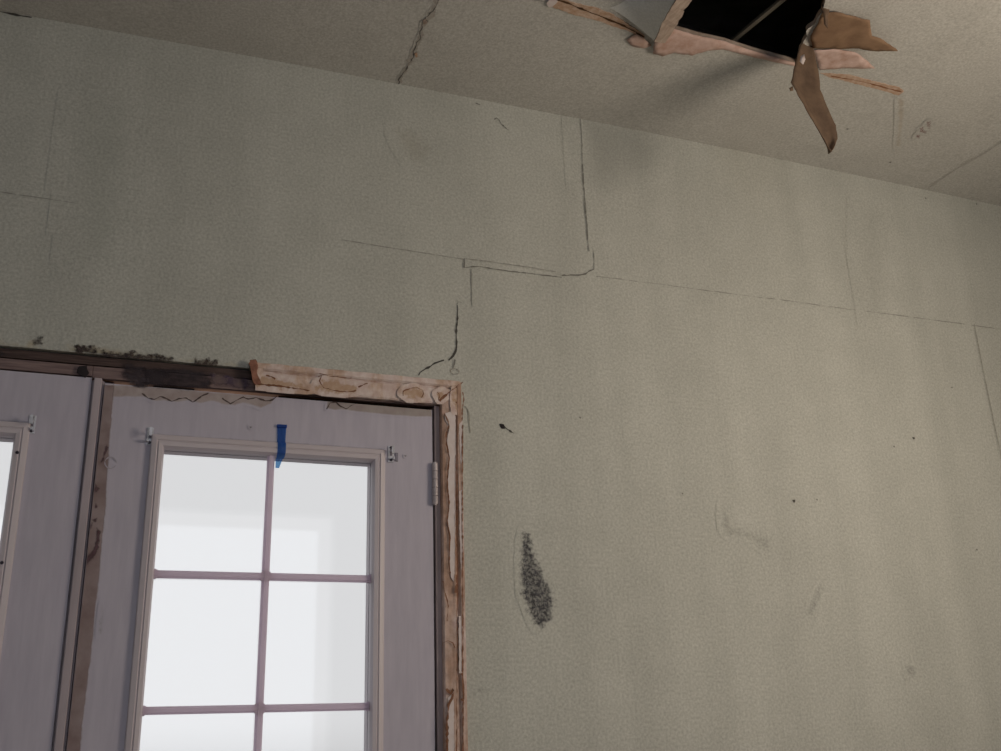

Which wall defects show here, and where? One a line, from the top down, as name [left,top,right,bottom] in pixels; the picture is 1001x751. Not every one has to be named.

crack [396,0,441,84]
spalling [677,0,822,59]
crack [341,119,1001,455]
damp [123,364,249,389]